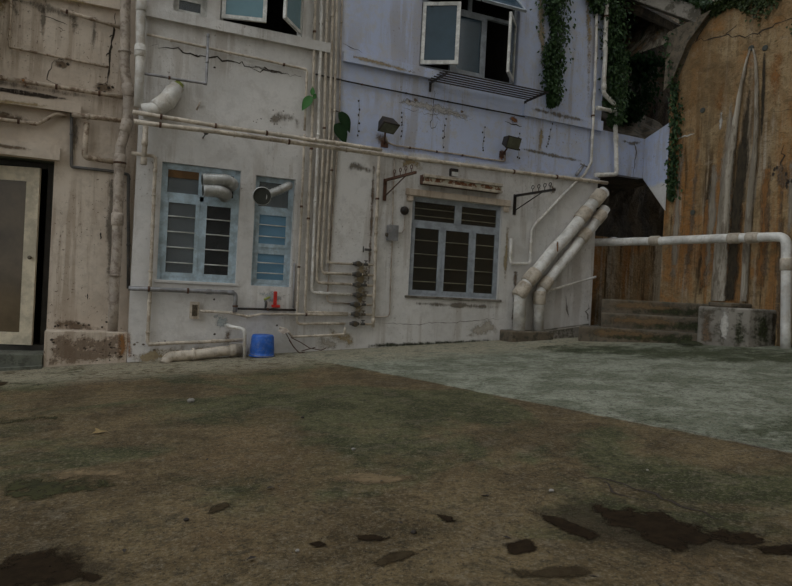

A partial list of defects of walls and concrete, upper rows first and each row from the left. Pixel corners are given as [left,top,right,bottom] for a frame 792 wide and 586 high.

crack [684,18,792,44]
crack [97,13,116,85]
spalling [49,335,123,364]